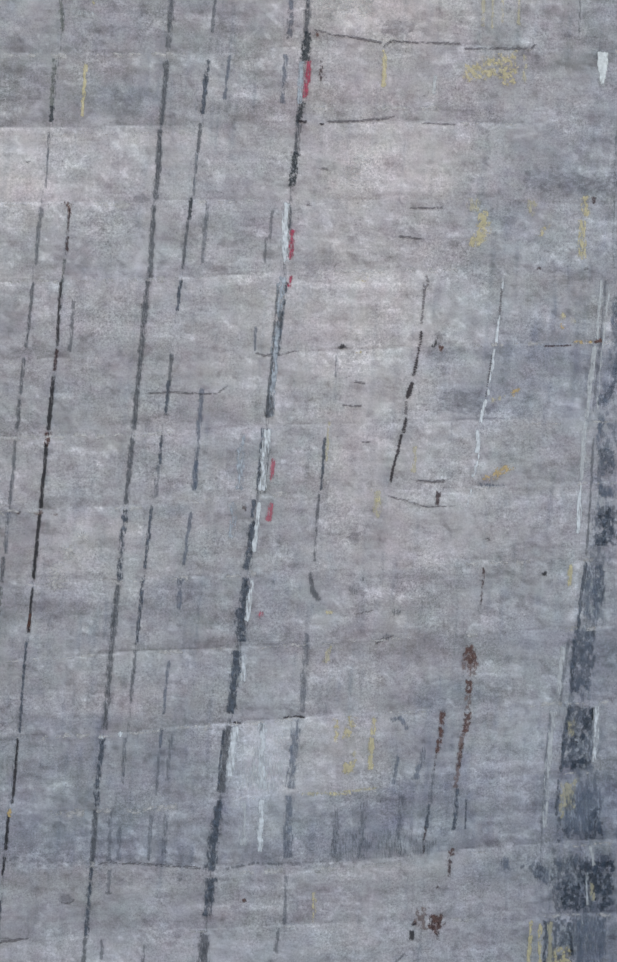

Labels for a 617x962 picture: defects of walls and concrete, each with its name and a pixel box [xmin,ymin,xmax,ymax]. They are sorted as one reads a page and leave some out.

corrosion [434,711,446,770]
corrosion [453,644,478,788]
corrosion [409,907,443,940]